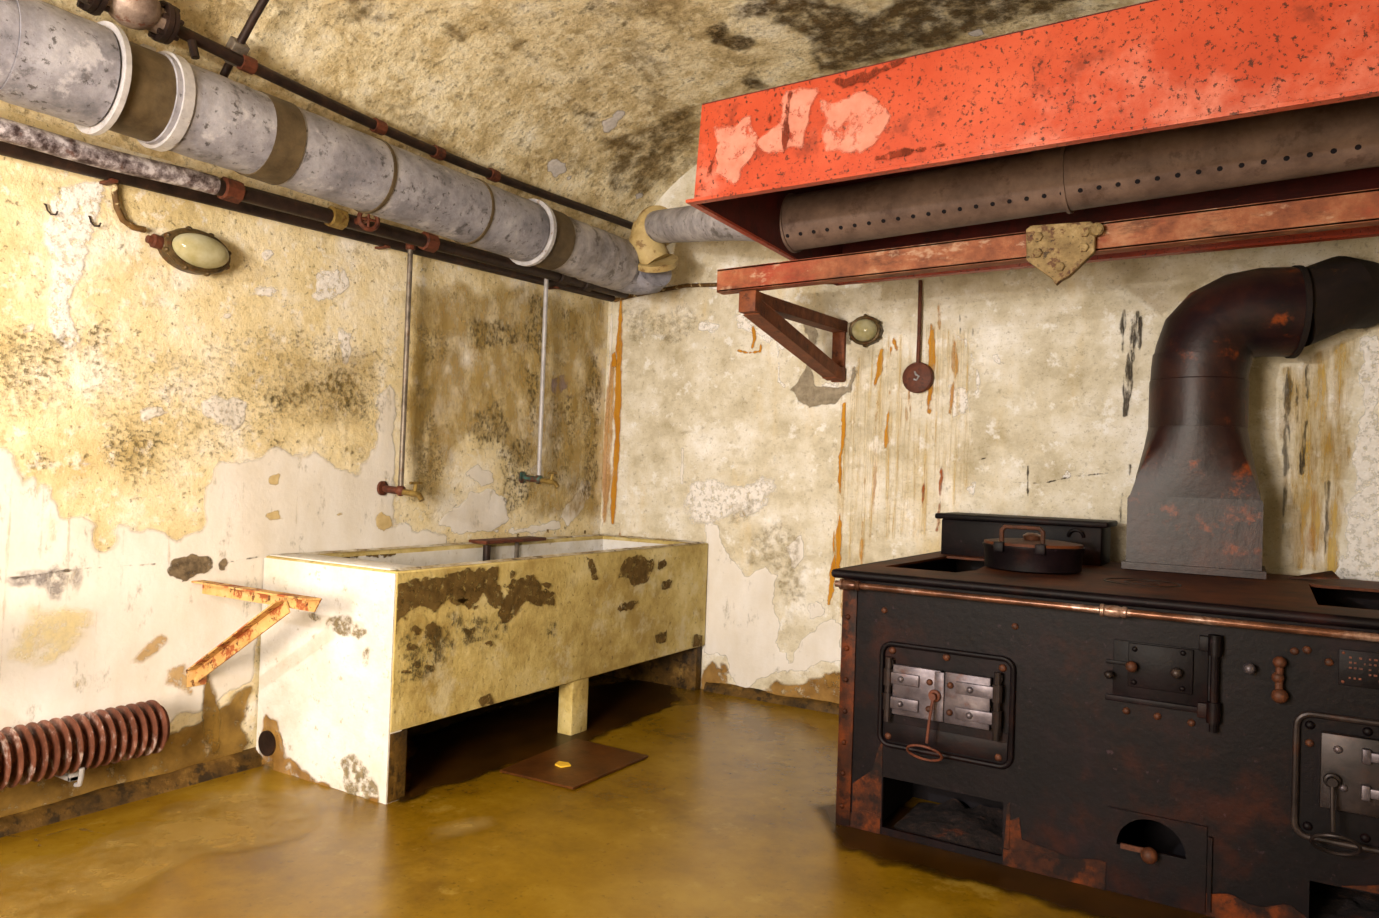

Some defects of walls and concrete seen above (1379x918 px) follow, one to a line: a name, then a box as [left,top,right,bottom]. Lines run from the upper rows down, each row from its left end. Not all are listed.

peeling [0,117,221,348]
peeling [312,268,349,301]
water stain [0,325,66,400]
water stain [104,428,160,491]
water stain [267,370,367,416]
water stain [407,285,601,512]
corrosion [602,301,623,524]
corrosion [838,403,846,493]
corrosion [874,338,898,385]
corrosion [927,309,941,414]
corrosion [827,515,843,616]
water stain [401,612,507,681]